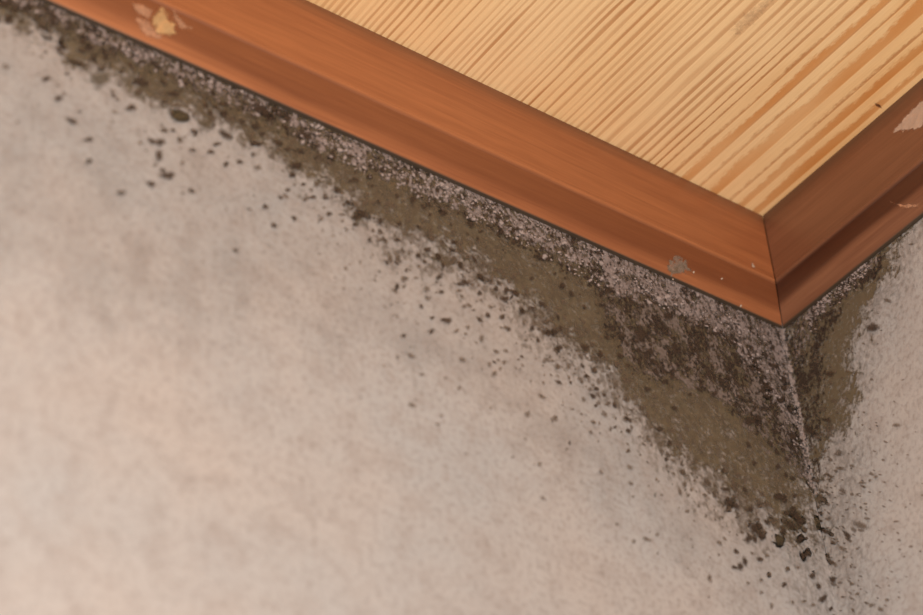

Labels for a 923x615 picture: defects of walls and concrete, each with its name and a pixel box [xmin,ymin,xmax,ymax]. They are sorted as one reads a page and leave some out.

leakage [139,130,174,179]
leakage [822,502,869,599]